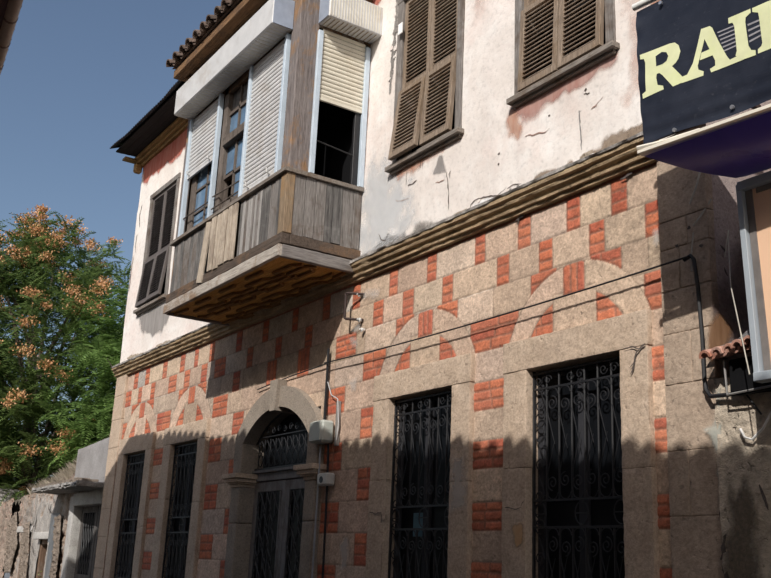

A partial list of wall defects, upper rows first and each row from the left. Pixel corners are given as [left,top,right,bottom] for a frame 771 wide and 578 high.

spalling [388,0,399,94]
crack [579,92,602,150]
crack [396,162,451,209]